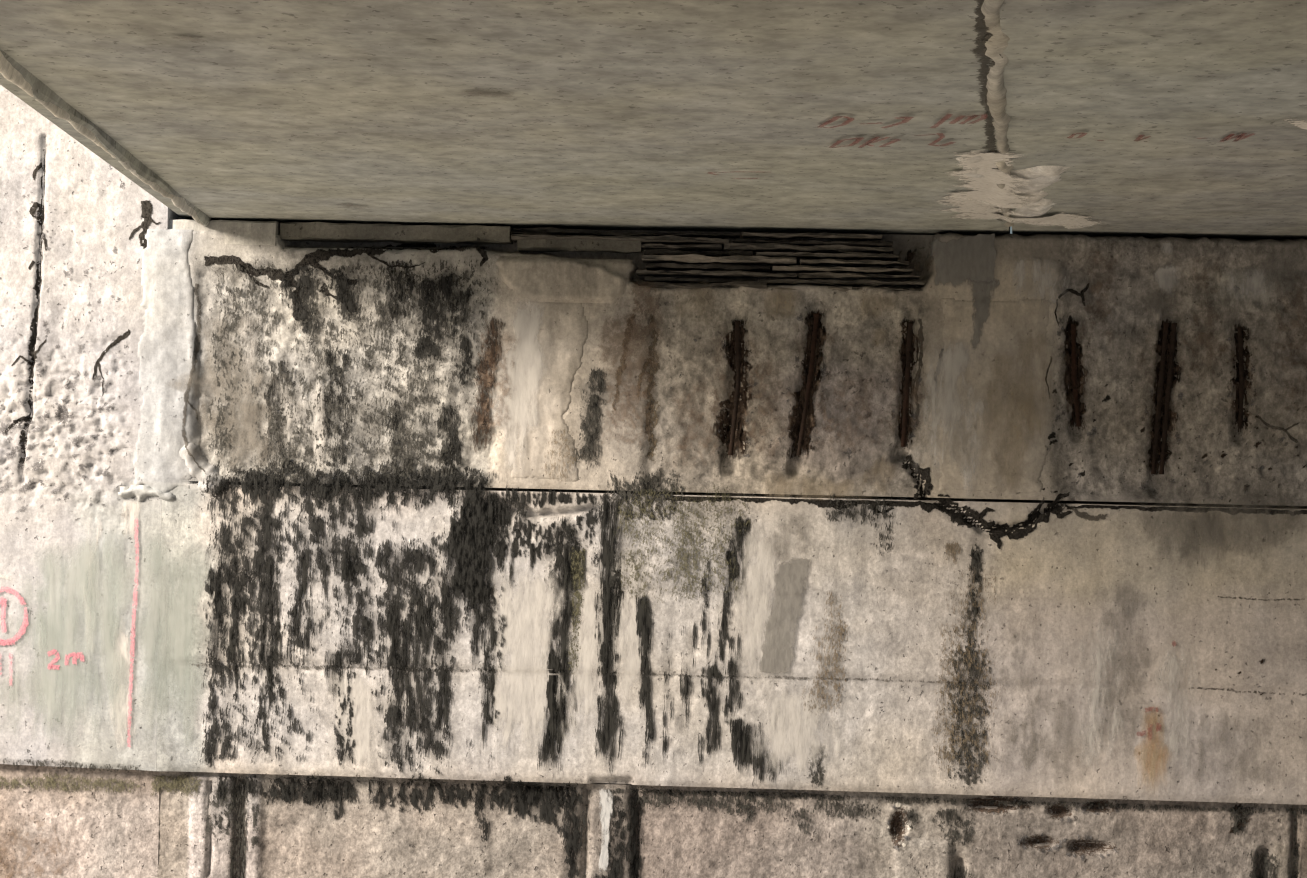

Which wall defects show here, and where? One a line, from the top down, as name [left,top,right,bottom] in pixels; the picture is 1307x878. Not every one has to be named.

crack [973,0,1003,170]
crack [5,139,47,468]
damp [0,259,1307,878]
crack [665,319,1307,549]